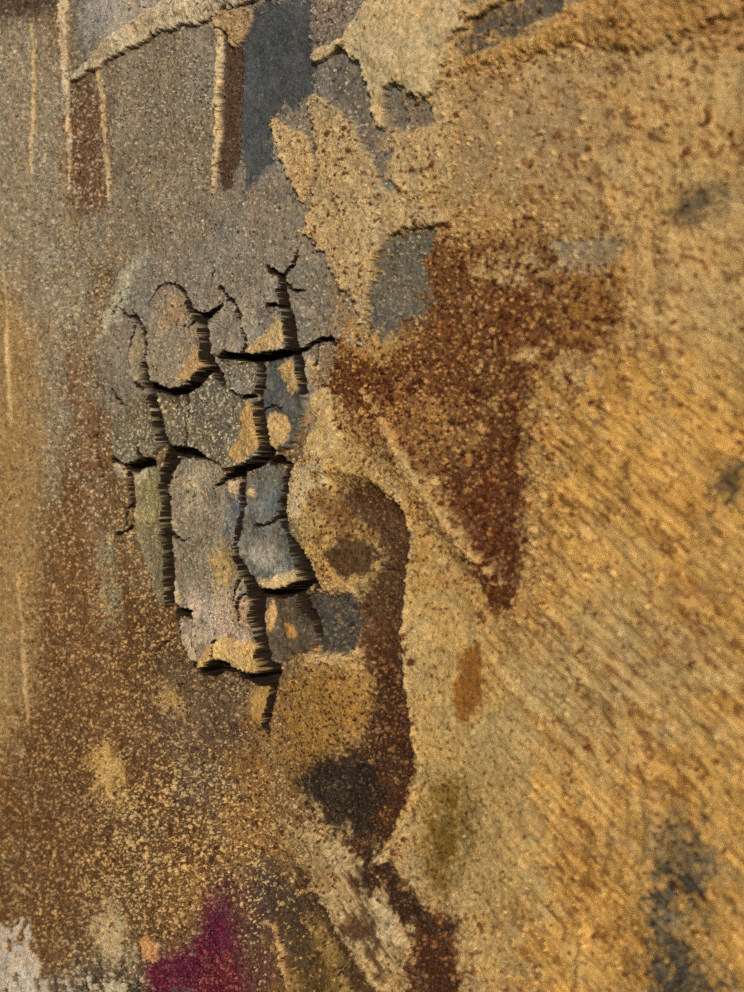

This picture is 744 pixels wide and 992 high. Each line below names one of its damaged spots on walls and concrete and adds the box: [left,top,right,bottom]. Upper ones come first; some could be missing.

crack [98,253,337,723]
peeling [210,0,505,349]
corrosion [312,224,631,992]
spalling [544,232,629,278]